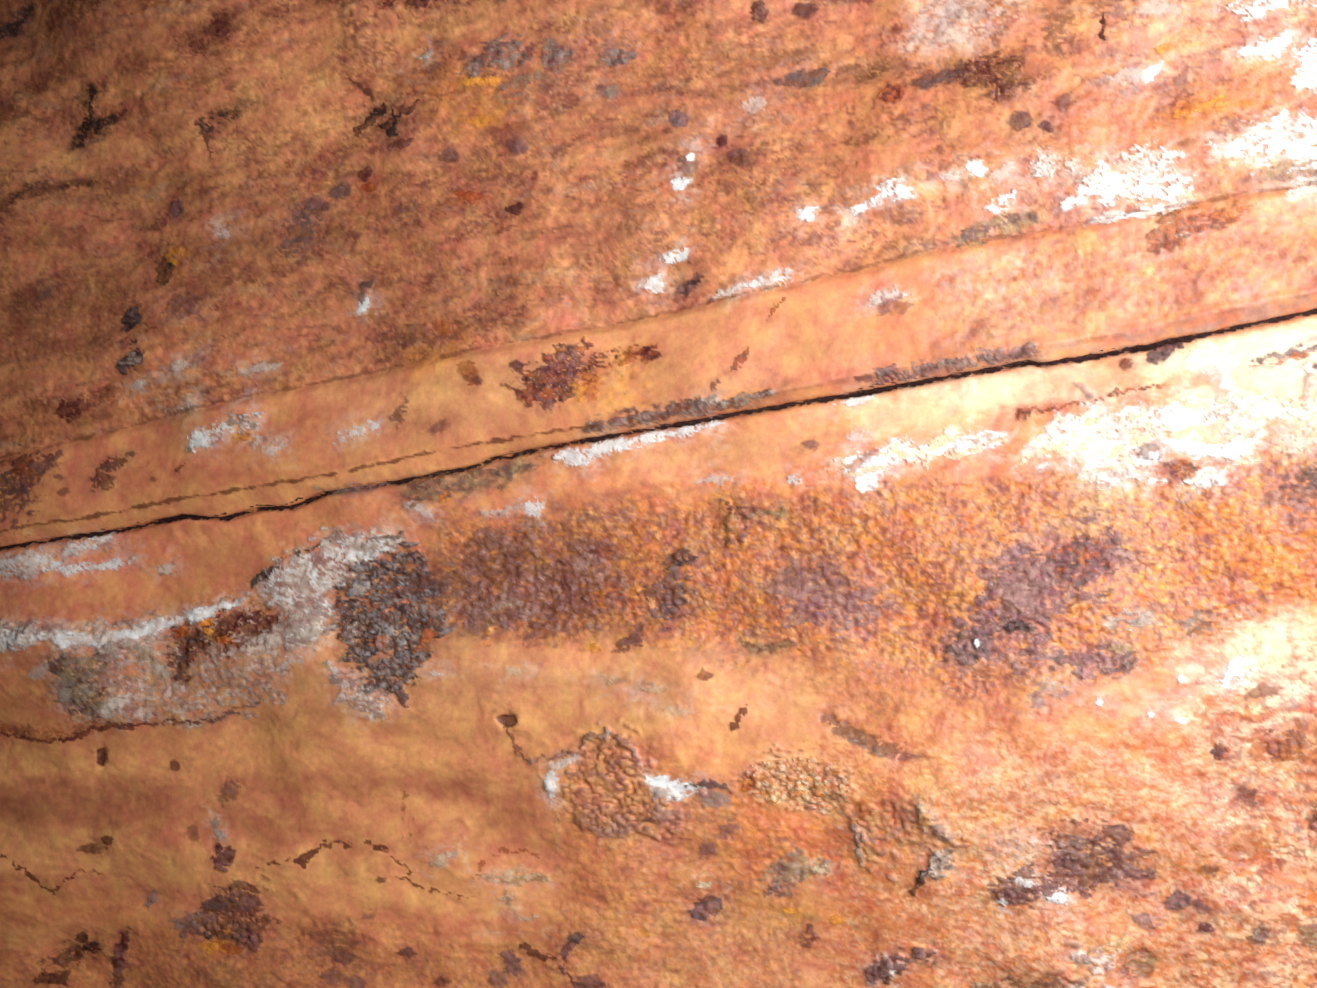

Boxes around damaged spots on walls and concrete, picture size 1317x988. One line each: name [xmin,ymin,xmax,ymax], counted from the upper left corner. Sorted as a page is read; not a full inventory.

corrosion [774,51,1052,131]
corrosion [501,337,661,410]
crack [0,308,1317,550]
corrosion [582,390,775,436]
corrosion [1120,342,1184,369]
leakage [43,556,136,575]
corrosion [166,598,279,681]
crack [251,531,342,588]
corrosion [433,518,698,653]
corrosion [942,509,1159,707]
corrosion [172,817,282,955]
corrosion [986,818,1215,933]